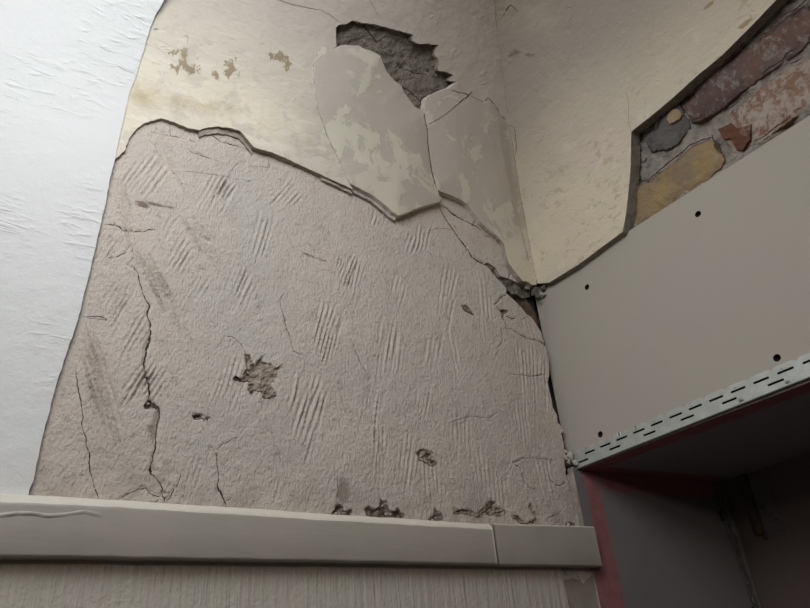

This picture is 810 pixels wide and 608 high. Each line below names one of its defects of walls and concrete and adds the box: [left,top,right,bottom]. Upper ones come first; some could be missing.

damp [168,48,200,75]
damp [212,57,240,79]
damp [269,51,292,71]
spalling [336,21,452,110]
flaking render [632,0,810,228]
crack [430,206,542,355]
crack [105,222,181,503]
spalling [232,354,283,401]
crack [76,377,99,499]
crack [208,437,237,505]
spalling [364,498,404,518]
spalling [452,501,536,525]